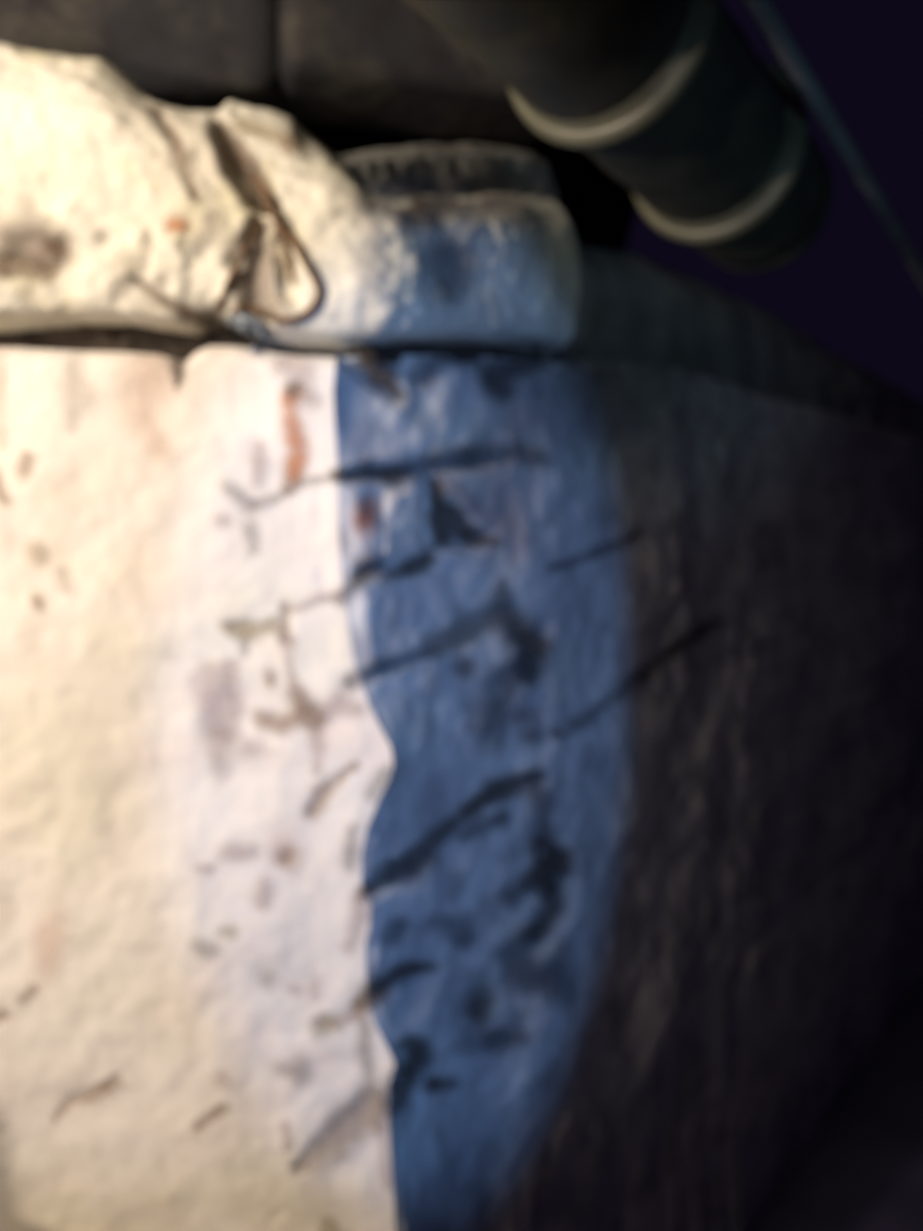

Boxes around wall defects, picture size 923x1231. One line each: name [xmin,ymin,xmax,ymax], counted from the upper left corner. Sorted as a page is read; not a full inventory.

crack [155,109,199,200]
crack [0,263,543,387]
rust [283,393,306,492]
crack [333,447,546,483]
crack [316,553,434,601]
crack [226,623,286,639]
crack [552,617,721,737]
crack [358,771,548,897]
crack [356,963,434,1008]
crack [304,1088,402,1169]